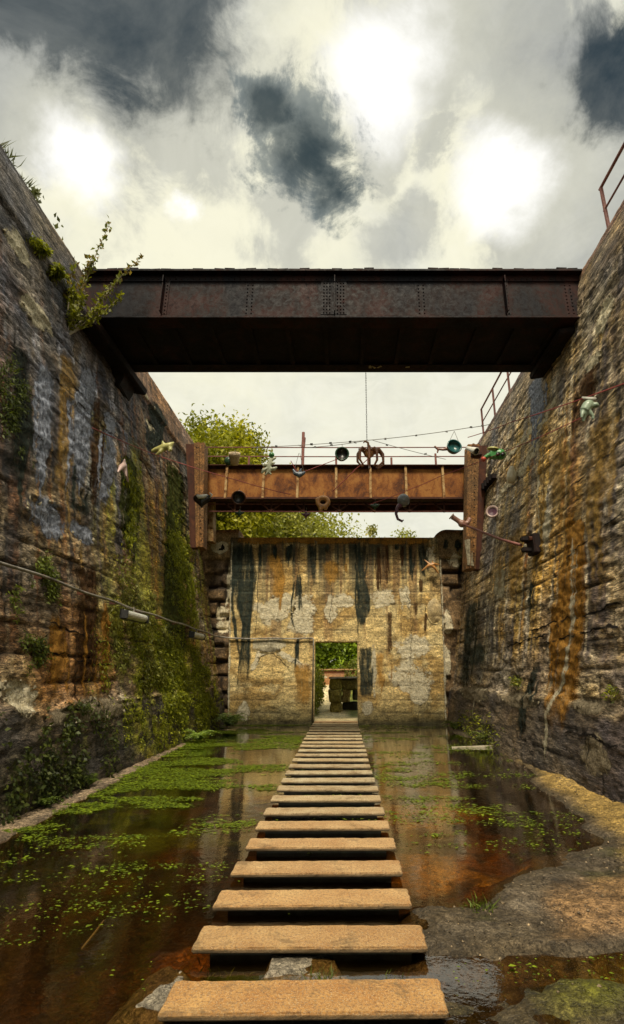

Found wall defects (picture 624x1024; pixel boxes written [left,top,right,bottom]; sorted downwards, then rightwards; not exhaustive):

water stain [10,345,141,545]
water stain [145,401,167,453]
corrosion [538,365,619,719]
water stain [225,543,329,721]
peeling [253,593,354,636]
water stain [353,545,371,634]
water stain [359,645,377,716]
peeling [388,634,435,705]
water stain [395,539,461,719]